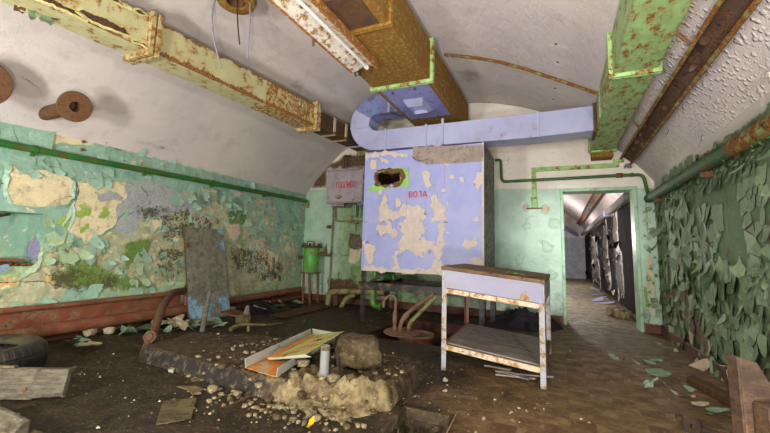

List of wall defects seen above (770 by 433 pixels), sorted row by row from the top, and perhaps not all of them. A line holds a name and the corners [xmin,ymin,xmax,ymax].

corrosion [35,0,149,49]
corrosion [723,113,770,155]
flaking render [0,124,307,308]
flaking render [585,210,624,301]
peeling [642,102,770,383]